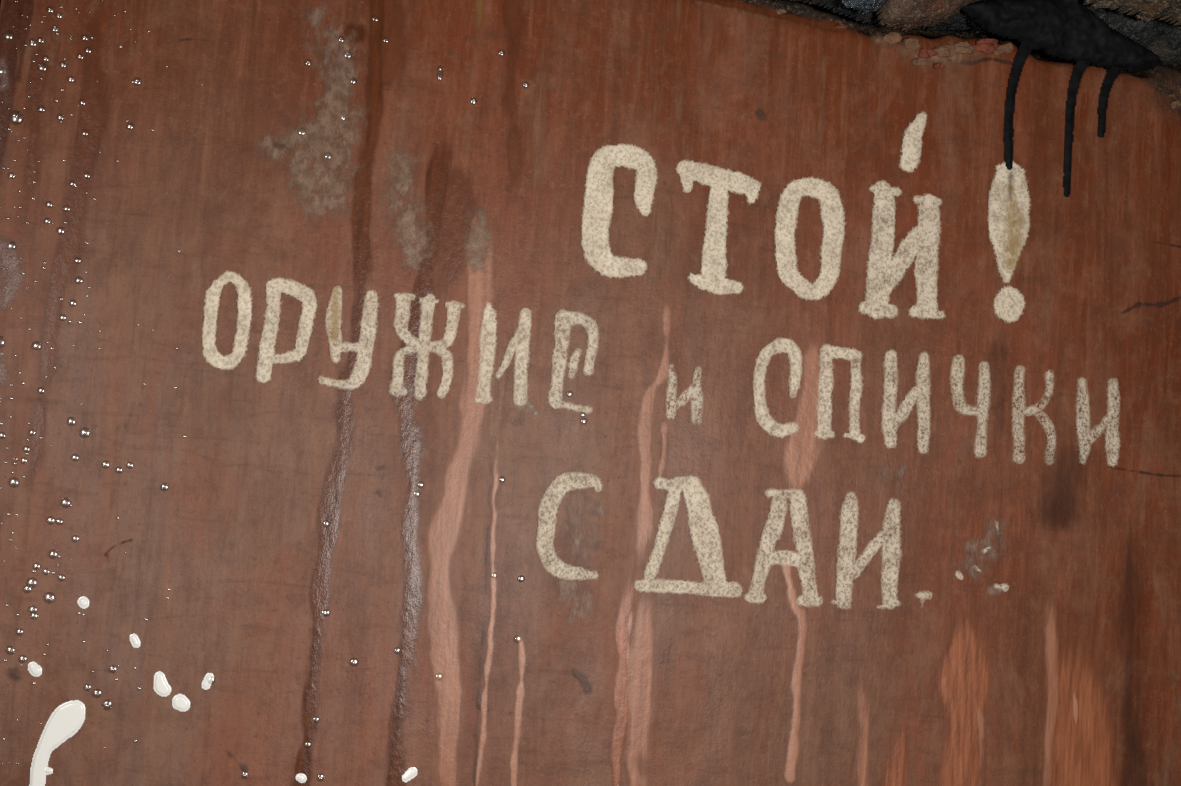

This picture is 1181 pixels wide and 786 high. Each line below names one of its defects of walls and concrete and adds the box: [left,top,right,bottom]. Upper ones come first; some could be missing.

leakage [382,152,429,270]
leakage [427,208,537,786]
leakage [636,305,670,558]
leakage [611,583,653,786]